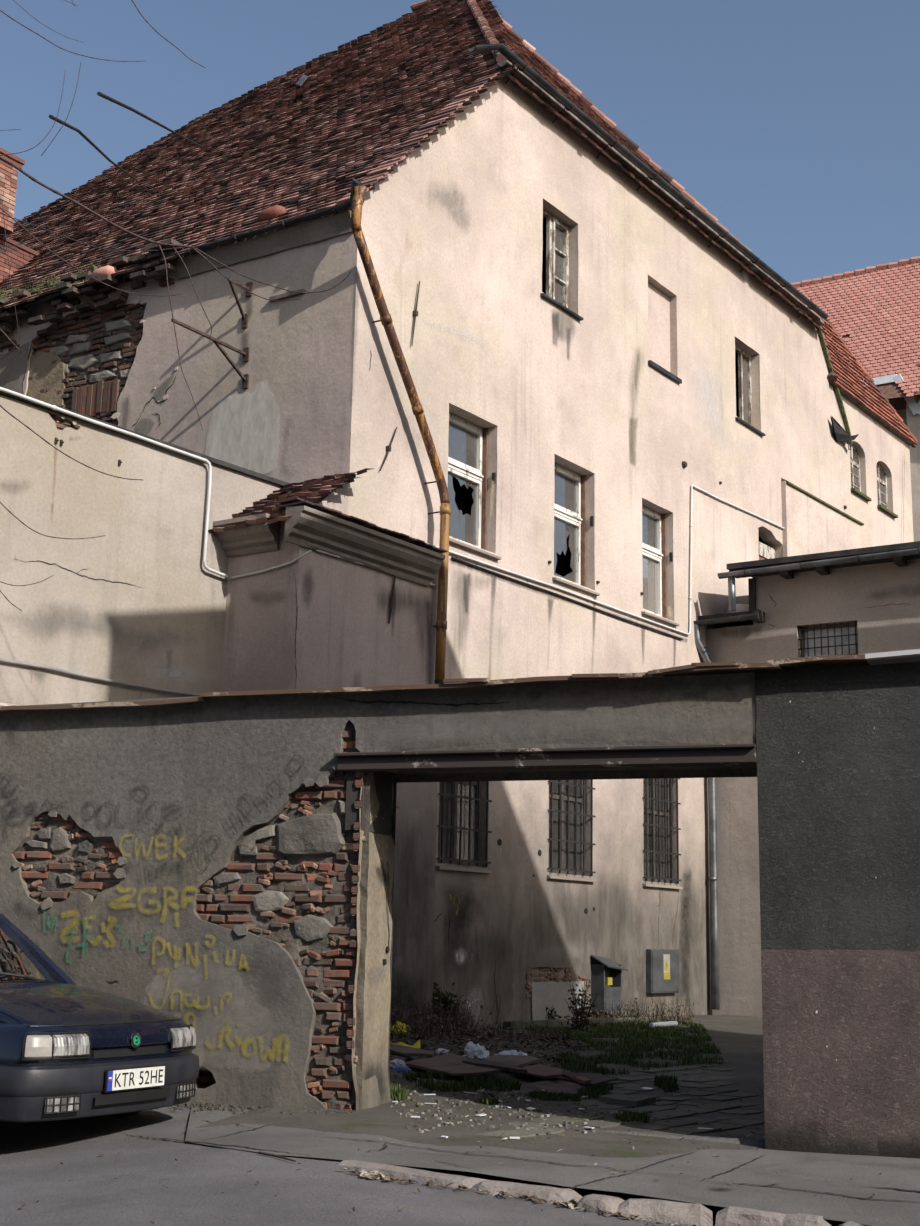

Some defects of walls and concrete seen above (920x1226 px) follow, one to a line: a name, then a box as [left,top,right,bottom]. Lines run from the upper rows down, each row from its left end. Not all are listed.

flaking render [26,299,146,430]
peeling [134,418,154,435]
crack [14,554,137,587]
spalling [12,810,128,910]
spalling [196,722,371,1111]